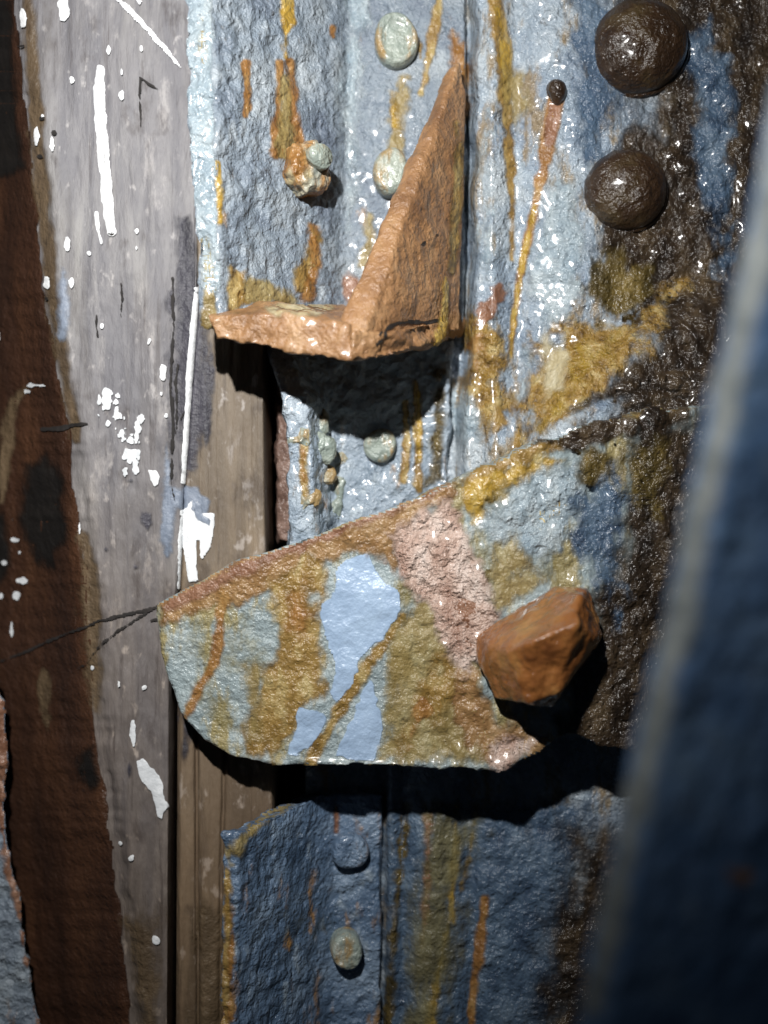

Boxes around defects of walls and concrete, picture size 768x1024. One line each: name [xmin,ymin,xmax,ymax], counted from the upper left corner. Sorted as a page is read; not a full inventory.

corrosion [159,0,768,772]
corrosion [187,804,290,1024]
corrosion [382,803,475,1024]
corrosion [467,896,489,1024]
corrosion [535,826,616,1024]